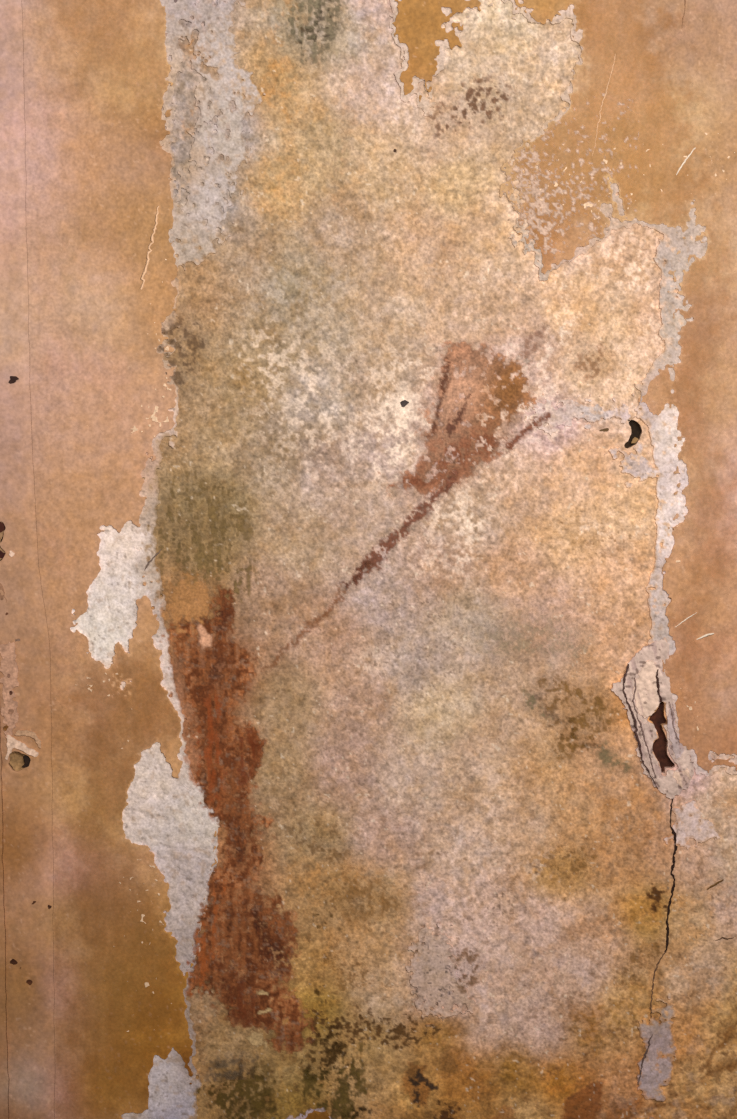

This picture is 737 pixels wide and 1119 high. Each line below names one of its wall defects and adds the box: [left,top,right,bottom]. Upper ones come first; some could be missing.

peeling [521,209,569,258]
peeling [511,165,584,217]
peeling [552,182,599,223]
flaking render [70,520,144,669]
leakage [159,472,252,601]
flaking render [611,639,694,799]
flaking render [122,742,219,972]
rust [163,574,316,1054]
crack [637,799,678,1085]
flaking render [121,1047,189,1119]
leakage [197,1075,276,1119]
leakage [303,990,440,1119]